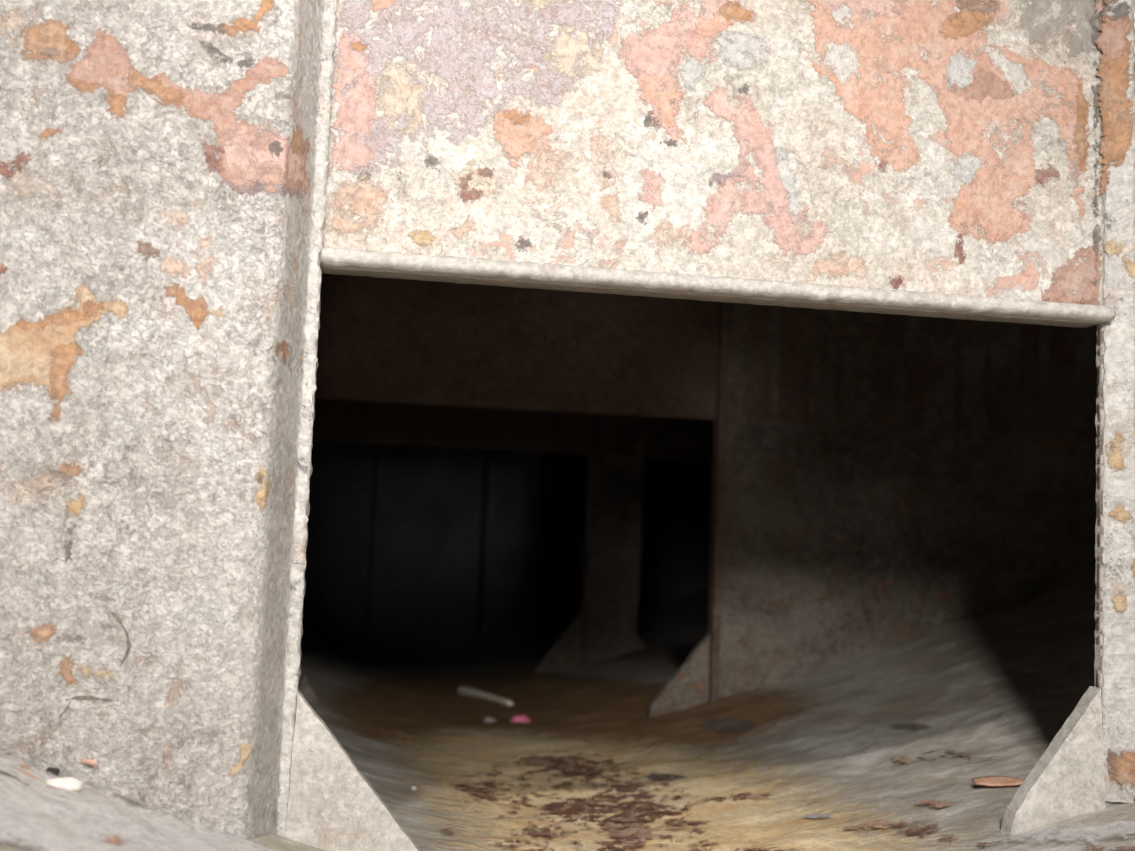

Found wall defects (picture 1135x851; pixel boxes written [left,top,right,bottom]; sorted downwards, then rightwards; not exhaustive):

peeling [61,28,311,205]
peeling [329,0,869,281]
peeling [804,0,1091,244]
corrosion [1093,0,1134,195]
peeling [1041,246,1103,305]
corrosion [329,670,955,851]